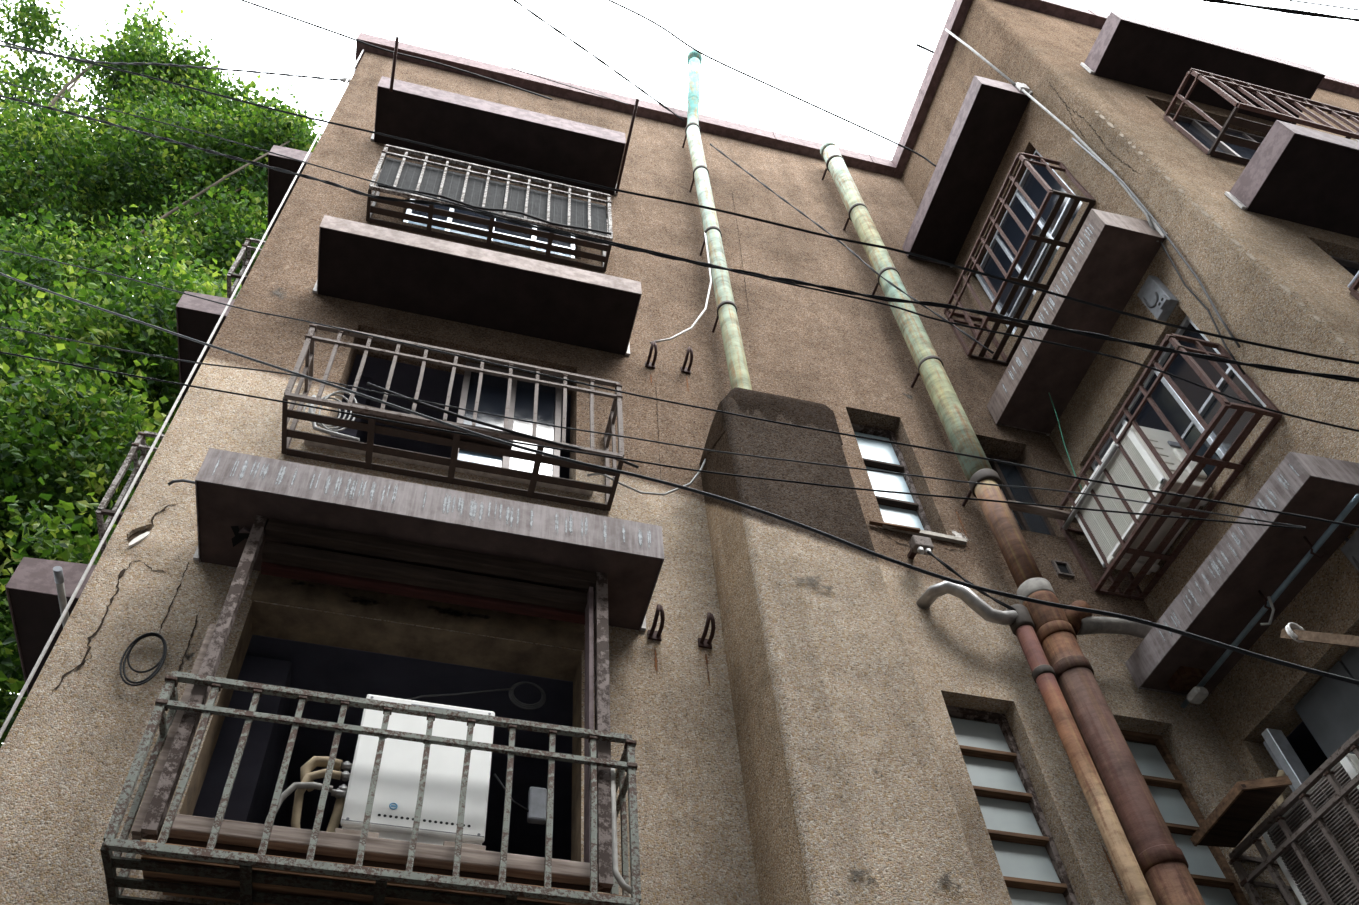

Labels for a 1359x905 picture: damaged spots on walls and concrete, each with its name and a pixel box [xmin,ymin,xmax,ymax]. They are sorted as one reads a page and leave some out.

crack [52,560,198,692]